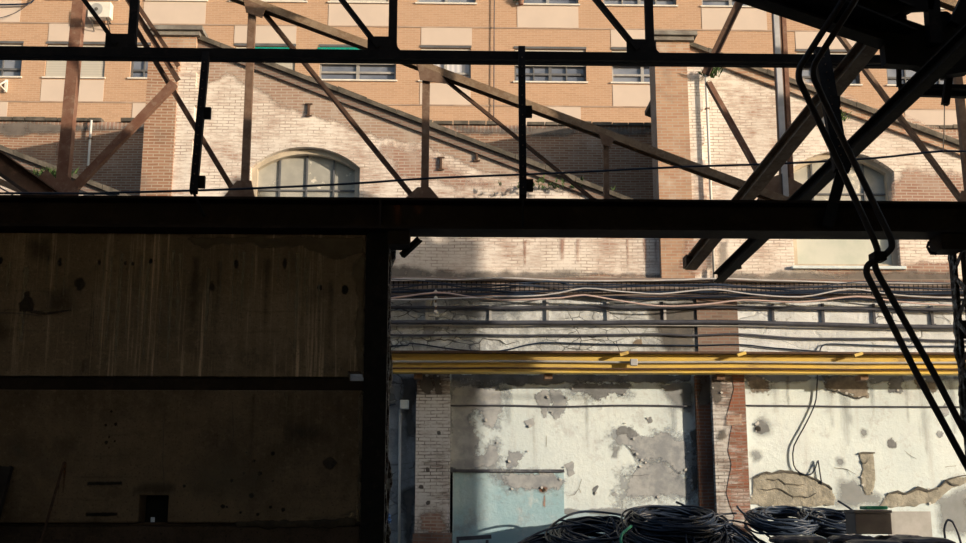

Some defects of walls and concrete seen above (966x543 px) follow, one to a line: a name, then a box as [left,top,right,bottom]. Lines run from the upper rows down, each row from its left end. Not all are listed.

crack [421,337,519,350]
flaking render [524,379,632,428]
flaking render [420,374,575,491]
flaking render [609,417,698,509]
spalling [858,452,875,495]
spalling [880,475,966,508]